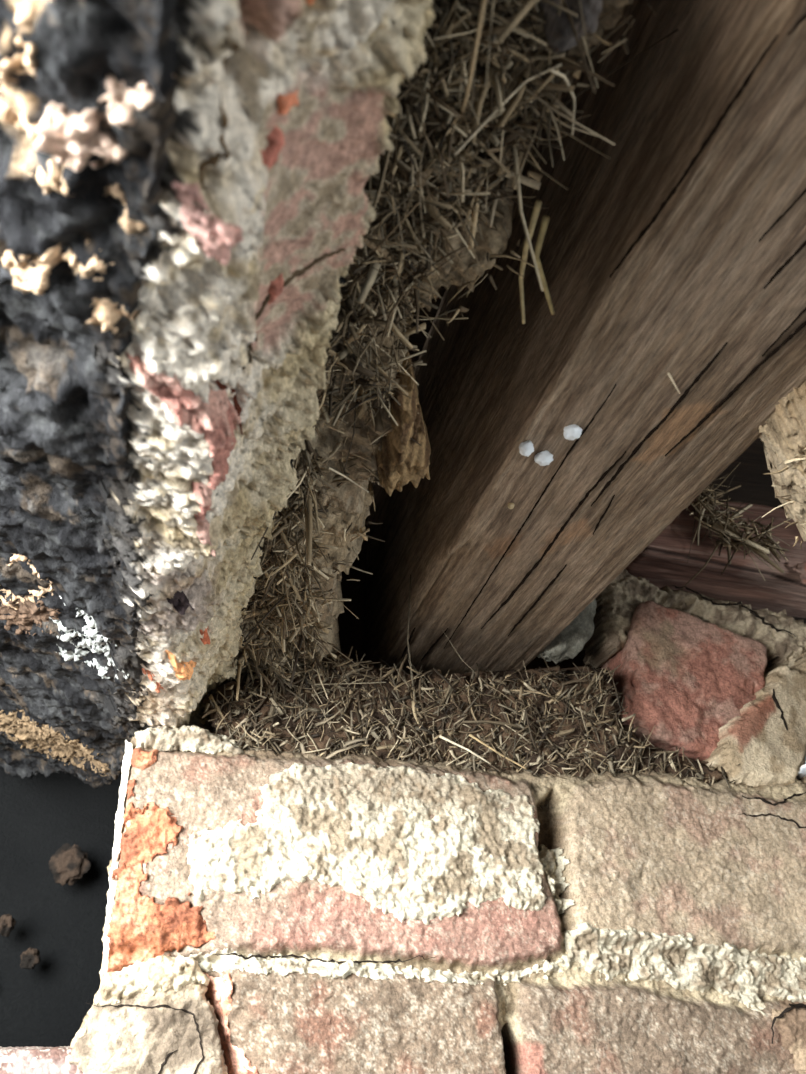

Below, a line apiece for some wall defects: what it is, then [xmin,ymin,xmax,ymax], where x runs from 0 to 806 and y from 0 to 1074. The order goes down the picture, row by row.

peeling [0,0,50,82]
peeling [0,95,40,140]
peeling [29,159,83,196]
peeling [13,278,49,295]
spalling [85,0,435,973]
peeling [7,553,53,584]
crack [738,792,806,828]
crack [88,1003,205,1074]
spalling [201,970,259,1074]
crack [771,1003,806,1044]